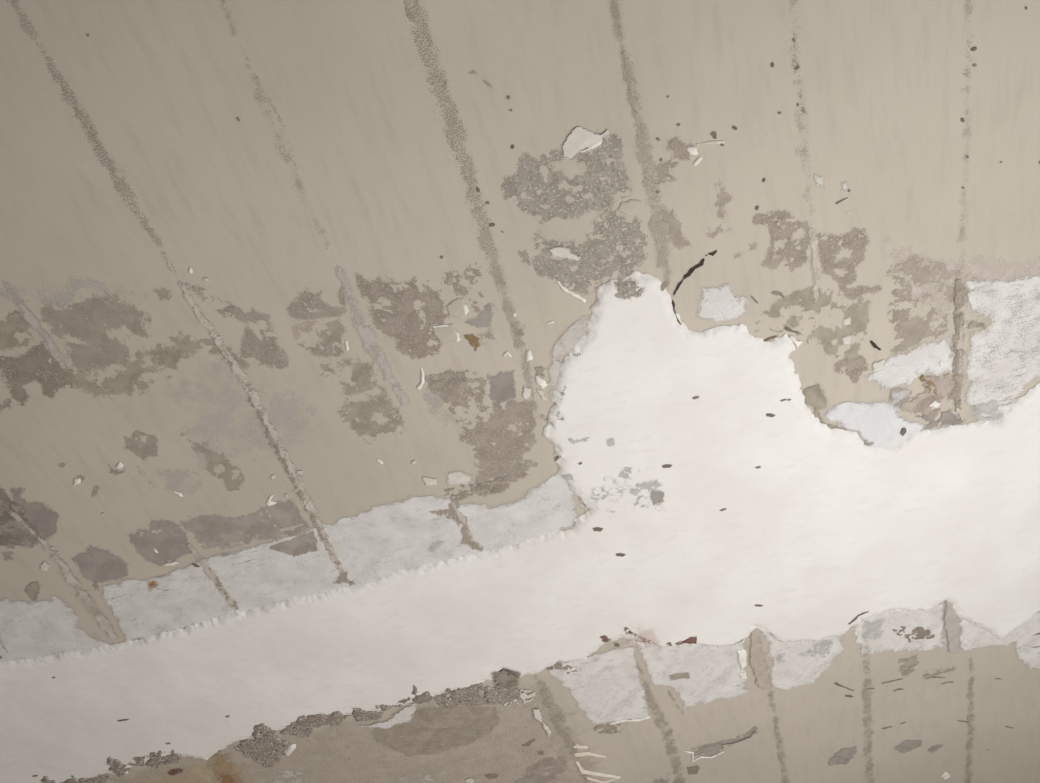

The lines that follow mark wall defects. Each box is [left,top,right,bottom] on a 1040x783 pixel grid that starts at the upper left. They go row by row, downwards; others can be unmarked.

peeling [501,127,648,303]
peeling [0,267,289,410]
peeling [287,286,407,445]
peeling [354,262,548,552]
crack [672,251,717,325]
peeling [732,181,978,383]
peeling [889,360,963,431]
peeling [0,487,128,591]
peeling [127,494,318,567]
spalling [32,743,181,783]
rust [112,750,254,783]
spalling [234,670,551,768]